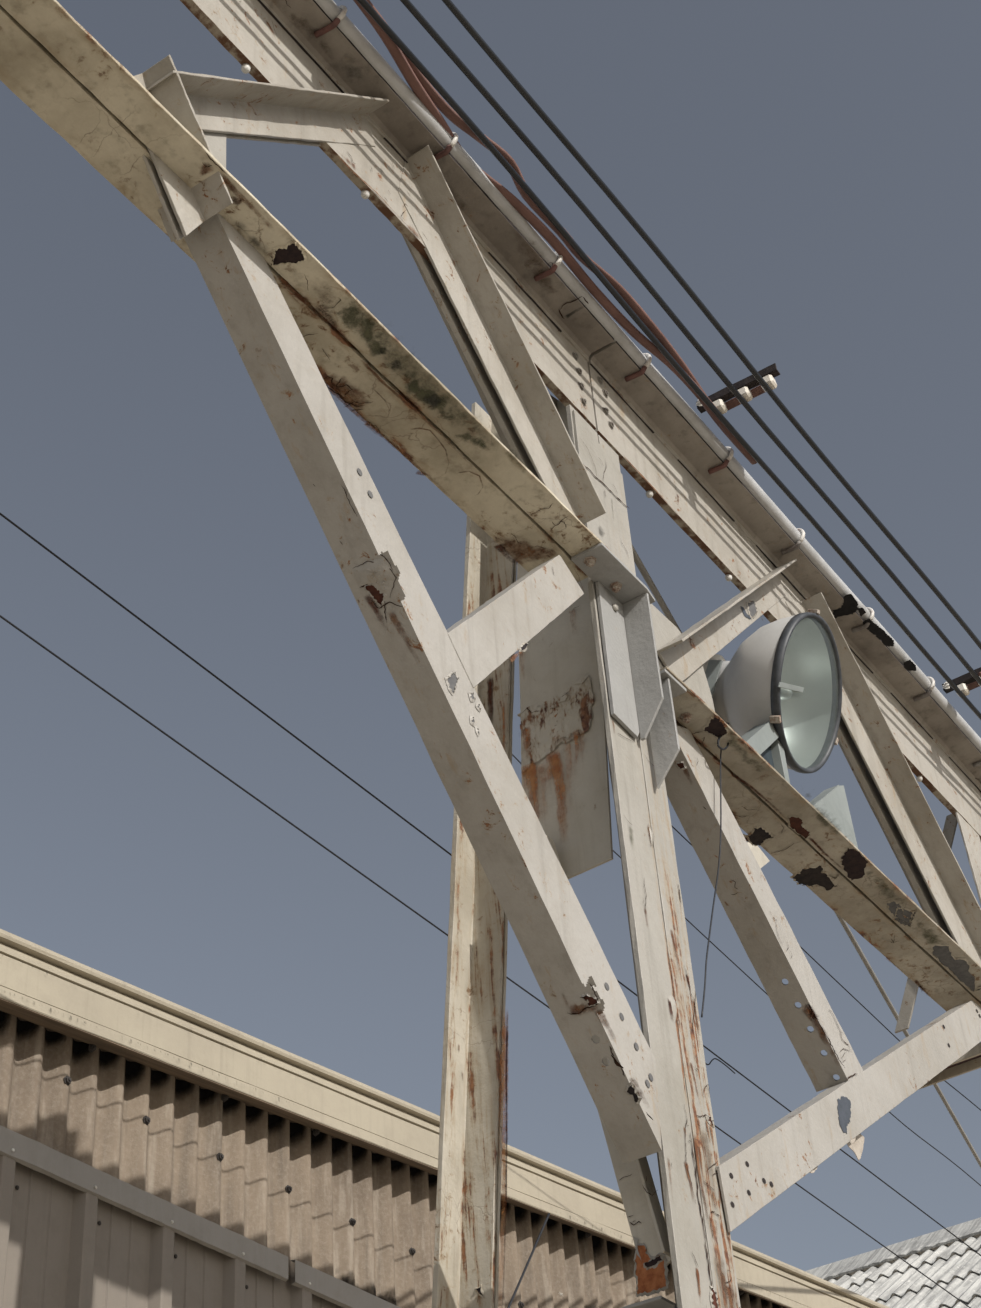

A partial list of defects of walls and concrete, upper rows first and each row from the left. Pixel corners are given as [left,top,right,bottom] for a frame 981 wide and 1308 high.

peeling [270,240,307,266]
leakage [344,302,485,448]
rust [364,581,409,644]
rust [522,728,578,823]
peeling [743,826,794,853]
peeling [790,848,868,891]
rust [560,976,612,1035]
leakage [0,1011,437,1187]
rust [499,1023,508,1220]
peeling [837,1096,864,1161]
leakage [500,1201,635,1258]
leakage [738,1283,785,1308]